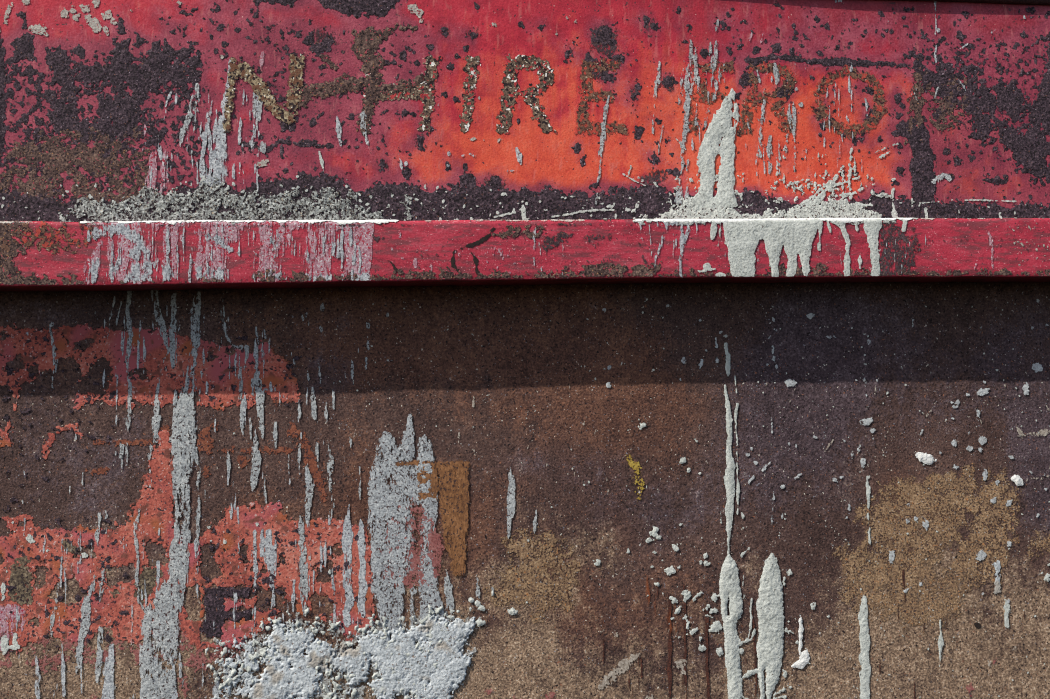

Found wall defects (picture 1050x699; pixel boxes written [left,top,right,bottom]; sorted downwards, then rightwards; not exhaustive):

peeling [0,0,30,32]
peeling [28,24,48,36]
peeling [60,0,117,36]
peeling [0,323,327,502]
peeling [0,423,445,655]
rust [483,526,581,624]
rust [832,463,1050,636]
rust [646,575,687,699]
rust [745,607,757,696]